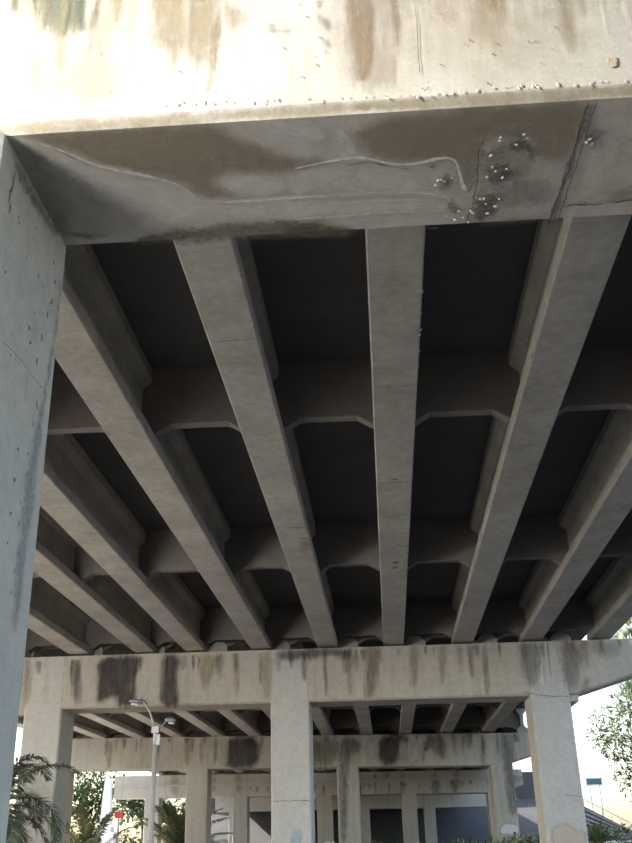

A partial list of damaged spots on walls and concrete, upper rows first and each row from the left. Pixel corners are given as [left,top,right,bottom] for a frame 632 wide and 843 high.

damp [156,0,217,45]
crack [548,102,632,225]